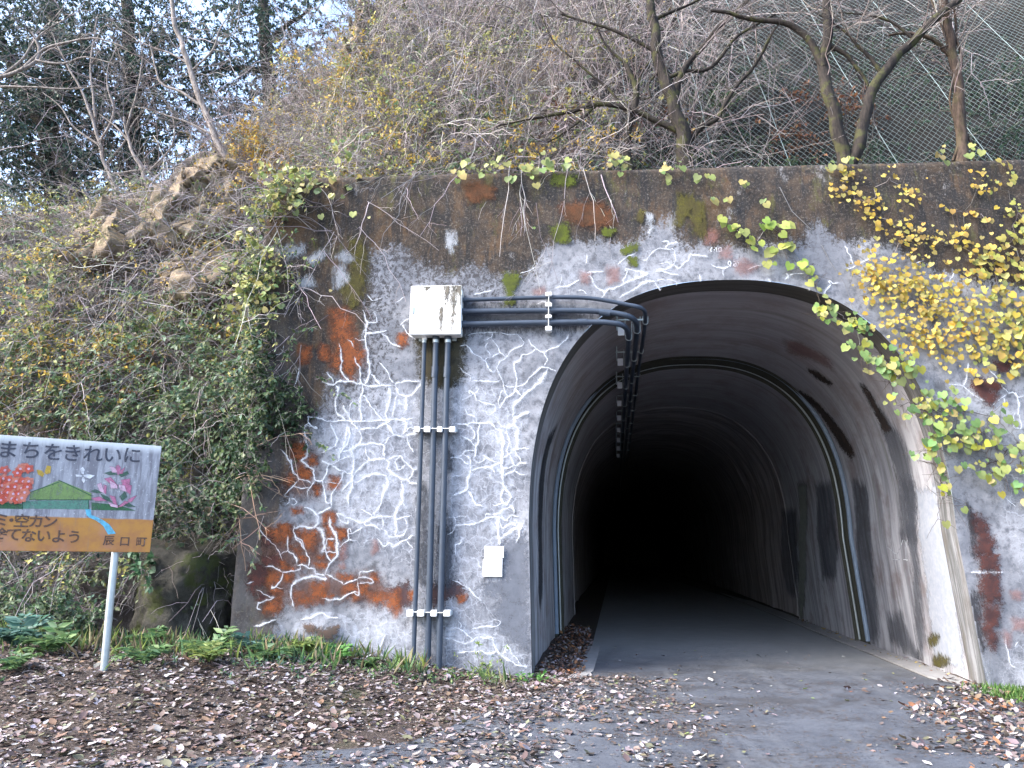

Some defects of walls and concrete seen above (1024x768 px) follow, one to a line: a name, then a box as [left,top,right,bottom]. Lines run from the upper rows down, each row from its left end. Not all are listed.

corrosion [556,198,618,231]
crack [538,227,803,304]
corrosion [297,307,365,383]
corrosion [245,441,414,618]
crack [250,295,421,626]
crack [445,332,568,668]
water stain [781,484,838,619]